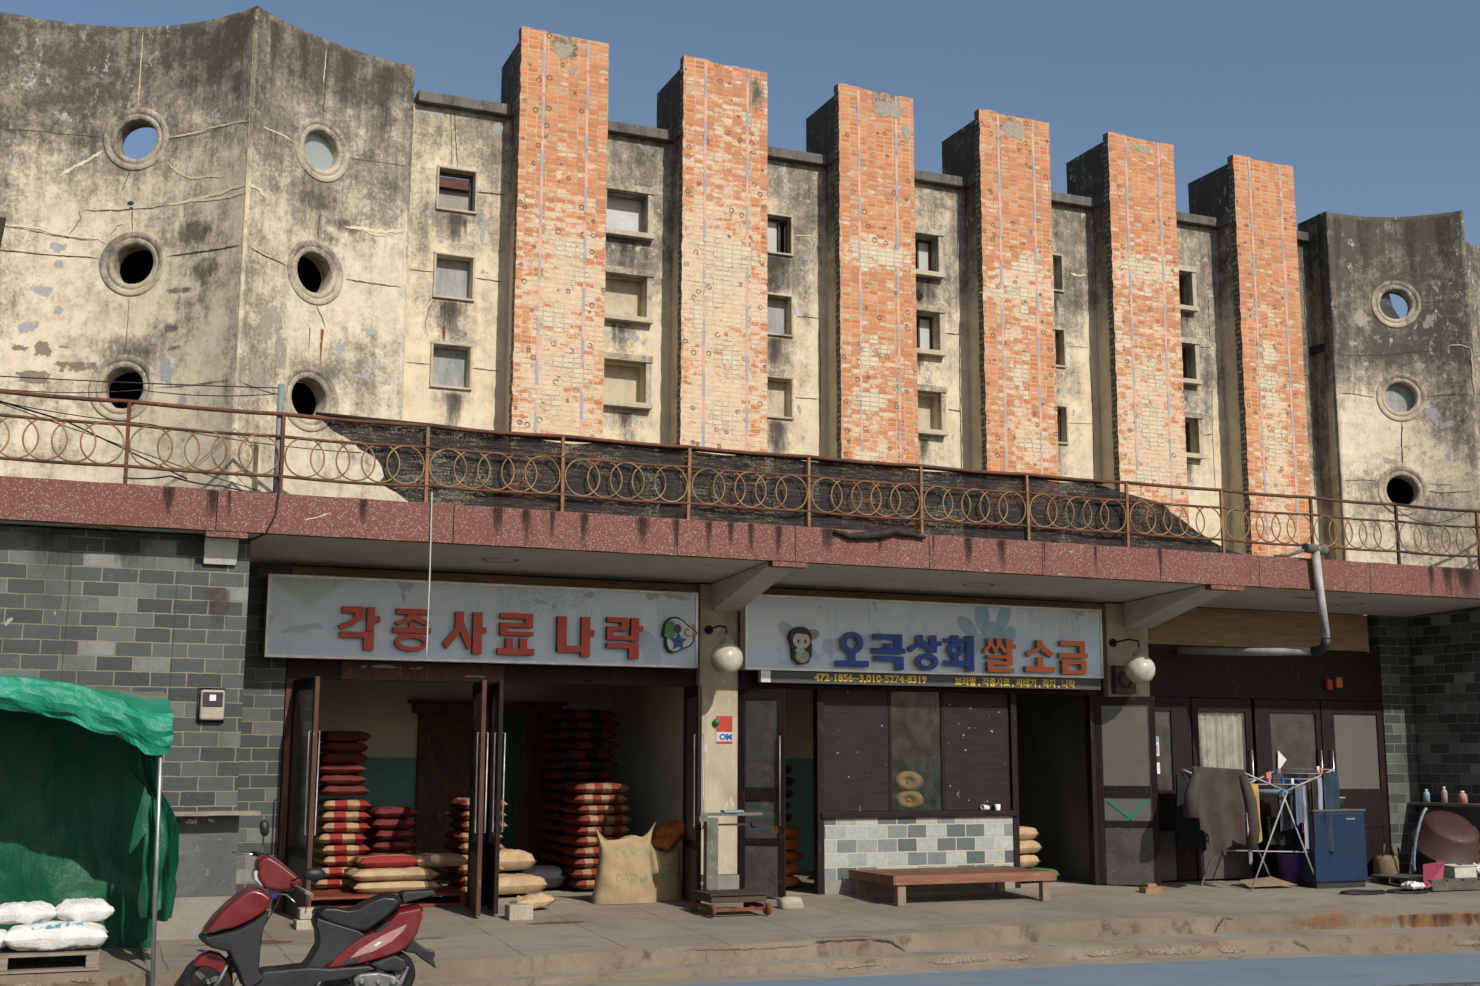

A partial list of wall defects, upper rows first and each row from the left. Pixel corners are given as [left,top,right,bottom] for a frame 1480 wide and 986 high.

crack [322,50,330,116]
damp [378,65,393,128]
crack [450,109,504,195]
peeling [554,42,578,76]
peeling [871,100,911,142]
peeling [29,284,64,315]
peeling [50,242,67,268]
crack [0,36,292,395]
damp [168,258,218,293]
damp [179,221,211,242]
crack [318,211,446,364]
peeling [12,320,97,384]